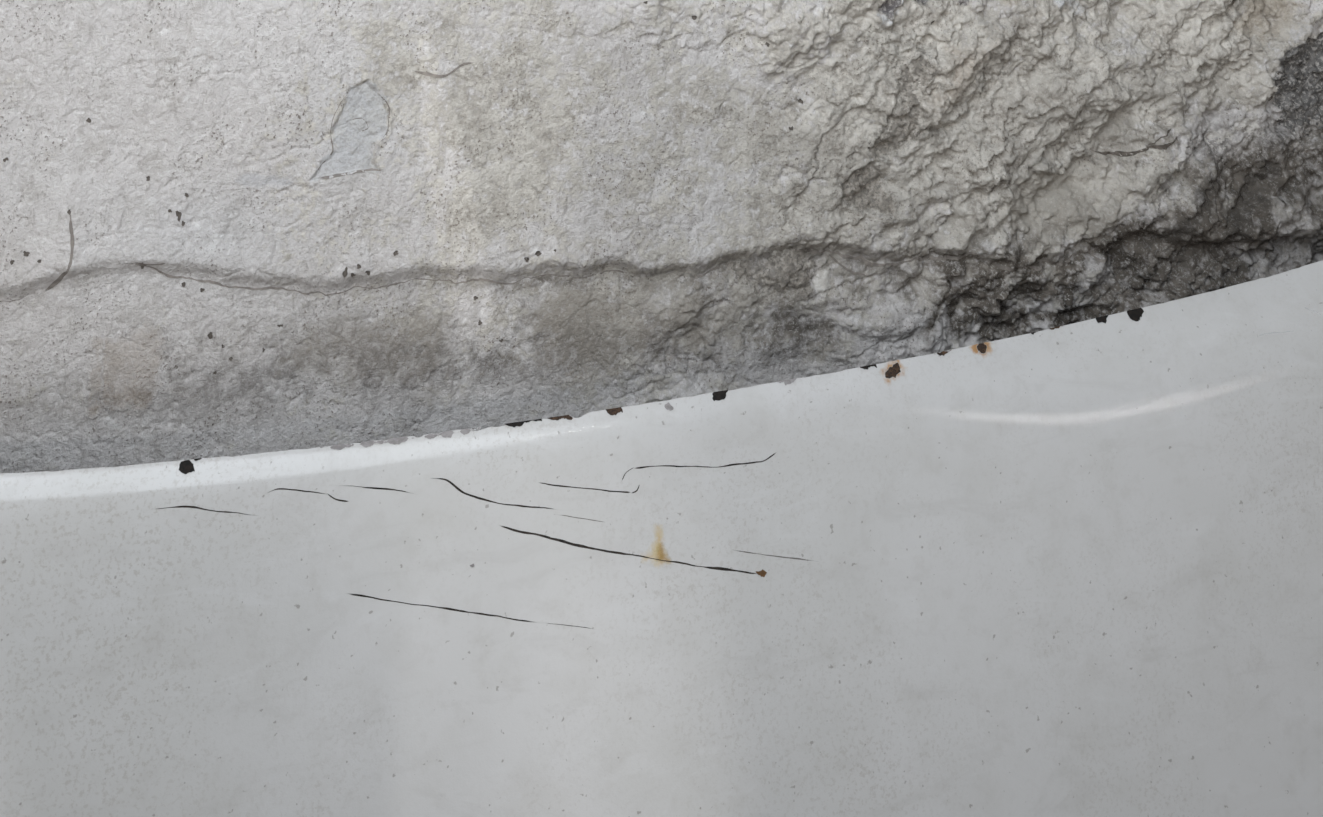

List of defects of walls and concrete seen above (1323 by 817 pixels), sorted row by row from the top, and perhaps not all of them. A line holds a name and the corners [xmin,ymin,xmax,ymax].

spalling [876,0,930,33]
leakage [912,27,1006,126]
leakage [1106,118,1323,307]
crack [0,215,74,302]
crack [135,262,651,296]
crack [157,506,248,515]
crack [272,453,808,574]
rust [640,523,673,570]
crack [352,594,591,629]